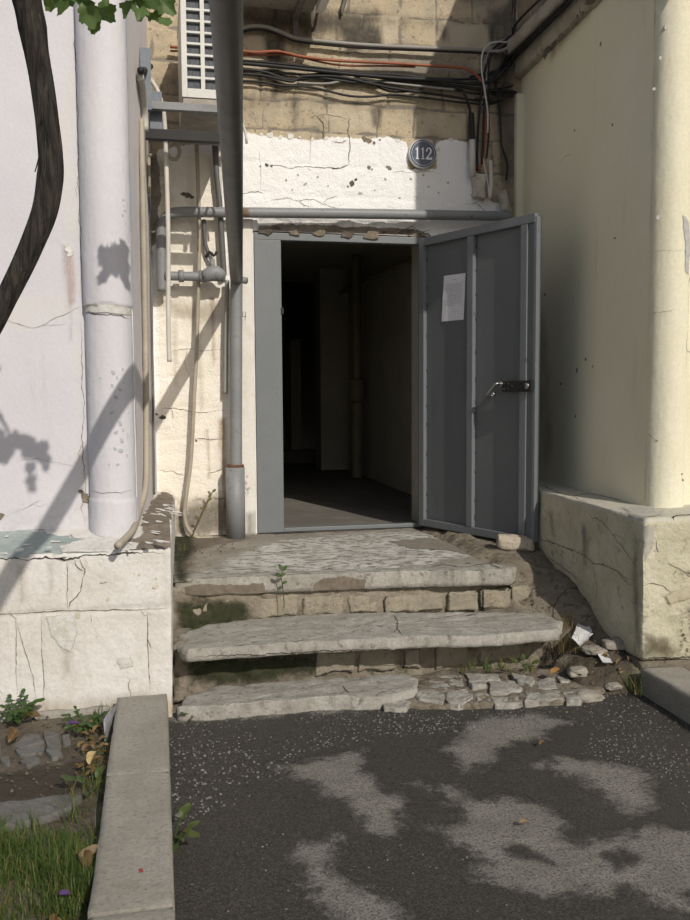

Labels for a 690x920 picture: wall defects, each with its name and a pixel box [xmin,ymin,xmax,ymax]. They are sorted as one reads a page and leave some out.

crack [243,114,351,208]
spalling [258,219,431,239]
crack [0,3,164,698]
peeling [0,492,182,559]
crack [540,486,690,618]
crack [537,641,579,669]